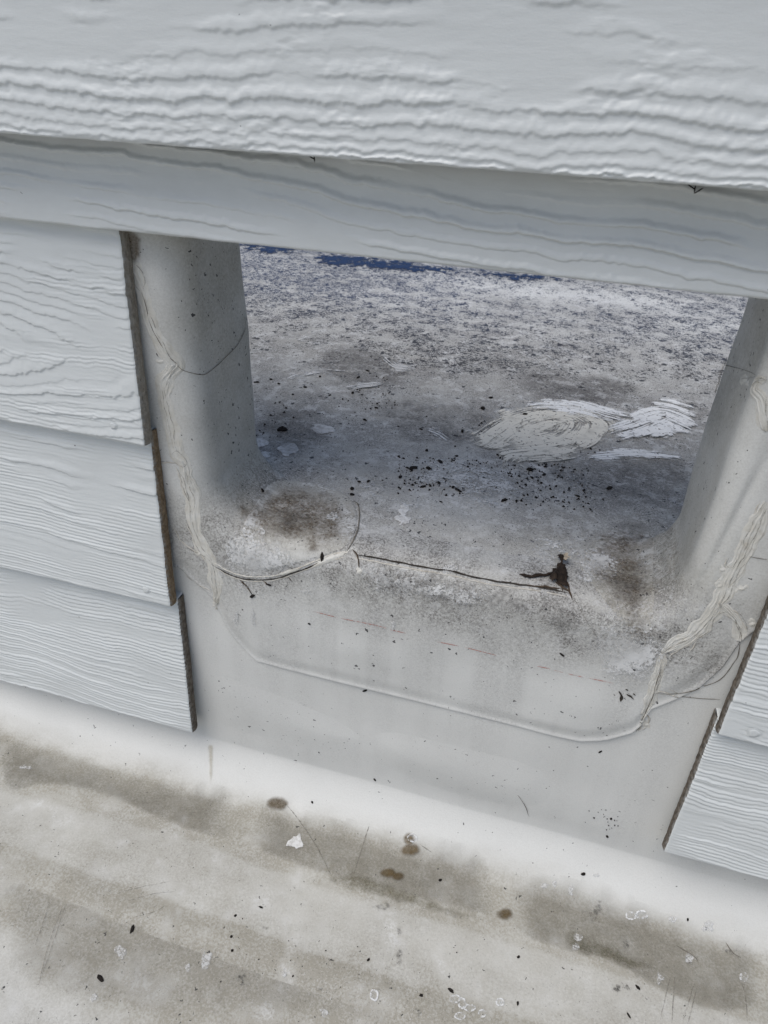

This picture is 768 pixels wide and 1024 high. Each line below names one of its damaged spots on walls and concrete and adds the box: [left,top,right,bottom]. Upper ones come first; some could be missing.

water stain [242,493,339,547]
crack [211,500,586,620]